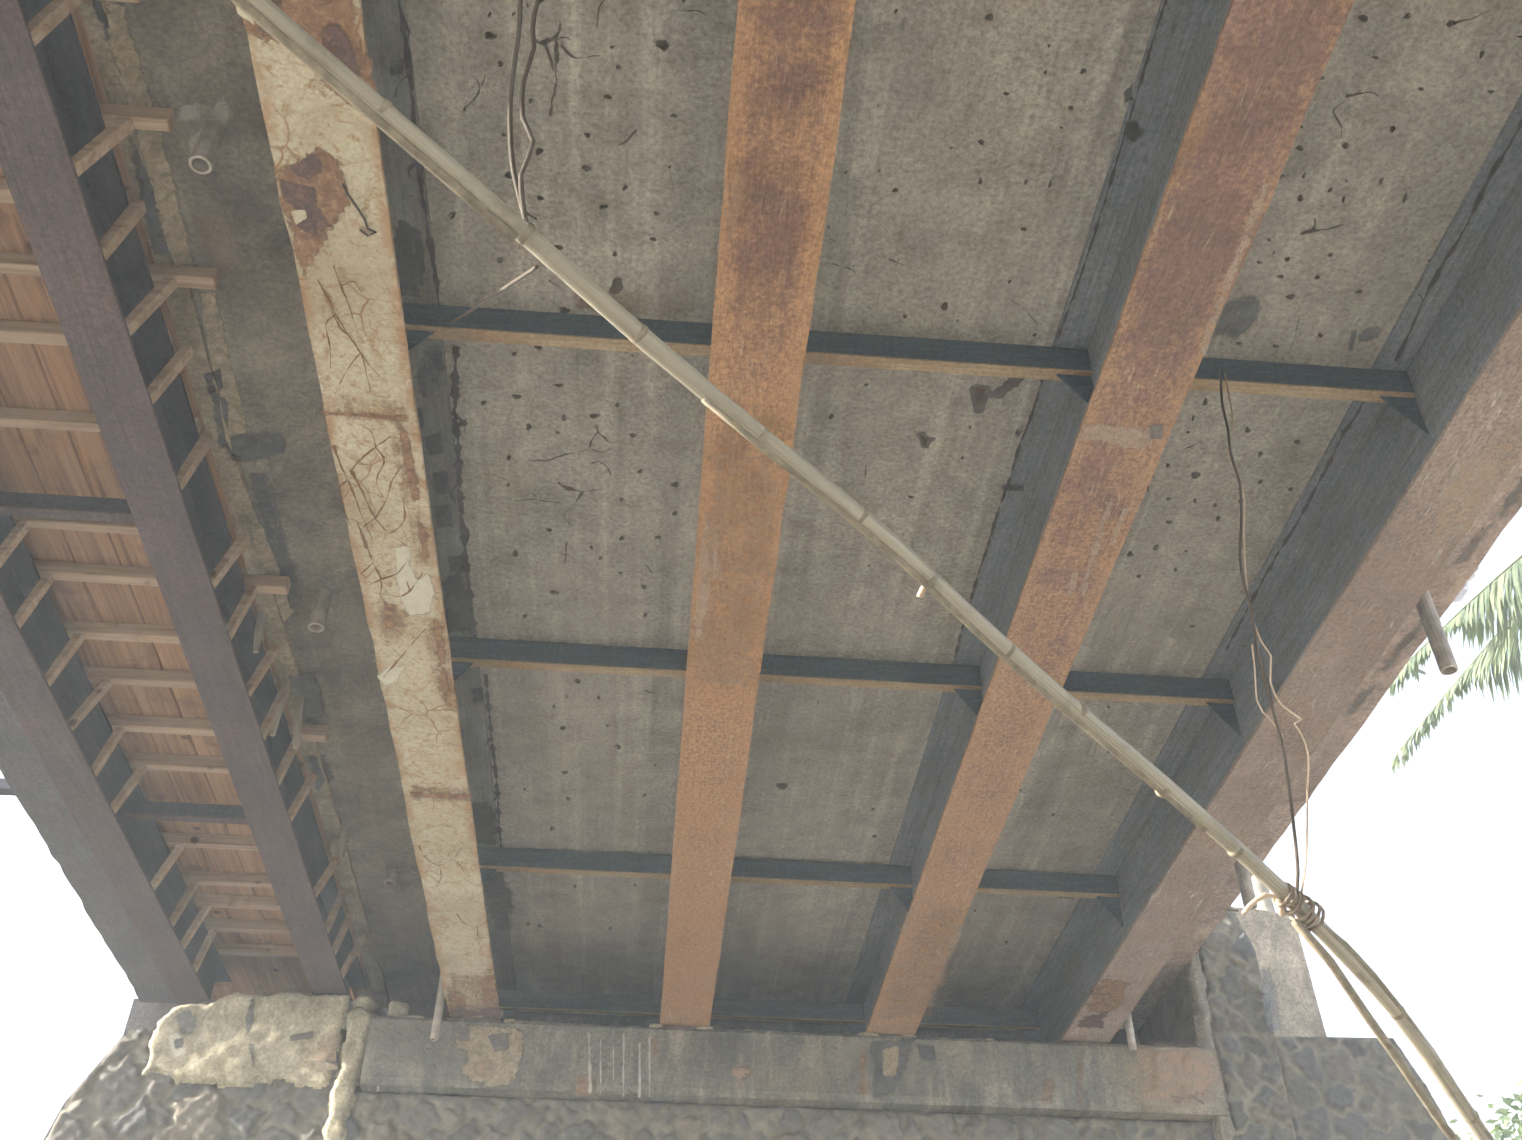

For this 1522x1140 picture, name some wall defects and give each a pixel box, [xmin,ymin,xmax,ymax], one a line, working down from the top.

peeling [232,2,279,43]
peeling [271,0,377,92]
peeling [276,147,351,277]
damp [1211,297,1261,338]
crack [384,628,426,677]
rust [1077,979,1130,1029]
peeling [169,1010,197,1057]
spalling [290,1031,340,1072]